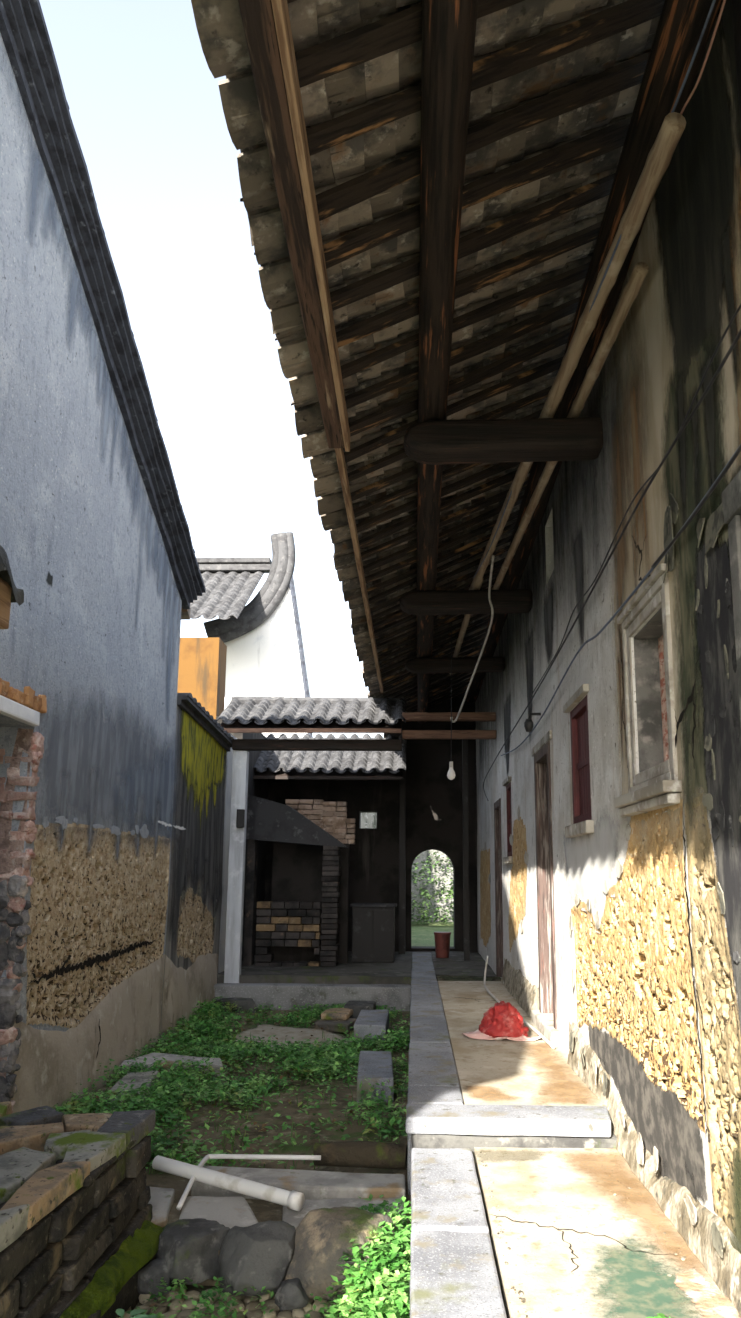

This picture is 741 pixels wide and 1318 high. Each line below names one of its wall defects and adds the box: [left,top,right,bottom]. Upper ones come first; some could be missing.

leakage [10,63,22,107]
leakage [614,0,741,821]
leakage [29,152,227,943]
leakage [573,529,584,644]
spalling [26,816,216,1029]
spalling [480,842,491,947]
spalling [508,806,528,953]
leakage [564,819,616,910]
spalling [569,493,741,1233]
crack [491,1214,678,1273]